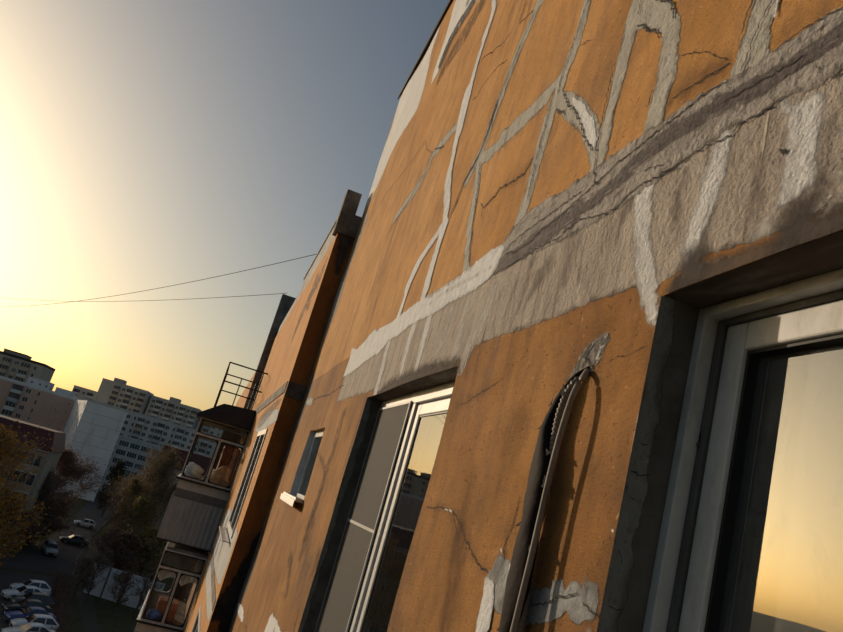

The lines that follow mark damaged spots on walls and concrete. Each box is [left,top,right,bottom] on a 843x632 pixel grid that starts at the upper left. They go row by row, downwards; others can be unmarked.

crack [365,0,843,318]
spalling [566,332,610,382]
crack [427,506,488,573]